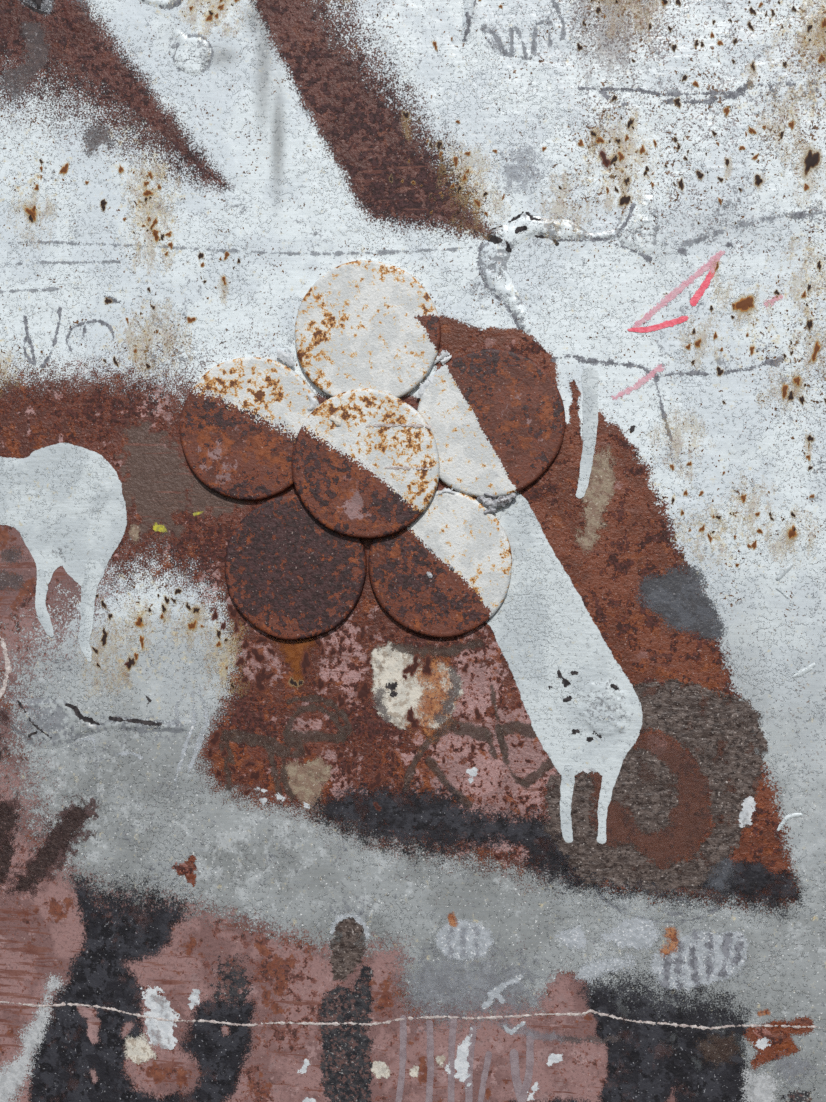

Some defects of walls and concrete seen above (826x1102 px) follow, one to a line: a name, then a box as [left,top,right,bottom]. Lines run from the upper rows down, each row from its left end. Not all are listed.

crack [462,0,476,42]
corrosion [695,1,784,49]
corrosion [0,0,234,201]
corrosion [206,0,505,243]
corrosion [578,116,634,205]
corrosion [804,149,820,191]
corrosion [133,217,173,256]
corrosion [731,296,754,319]
corrosion [782,376,806,405]
corrosion [0,313,801,914]
peeling [370,642,464,739]
corrosion [742,1009,814,1072]